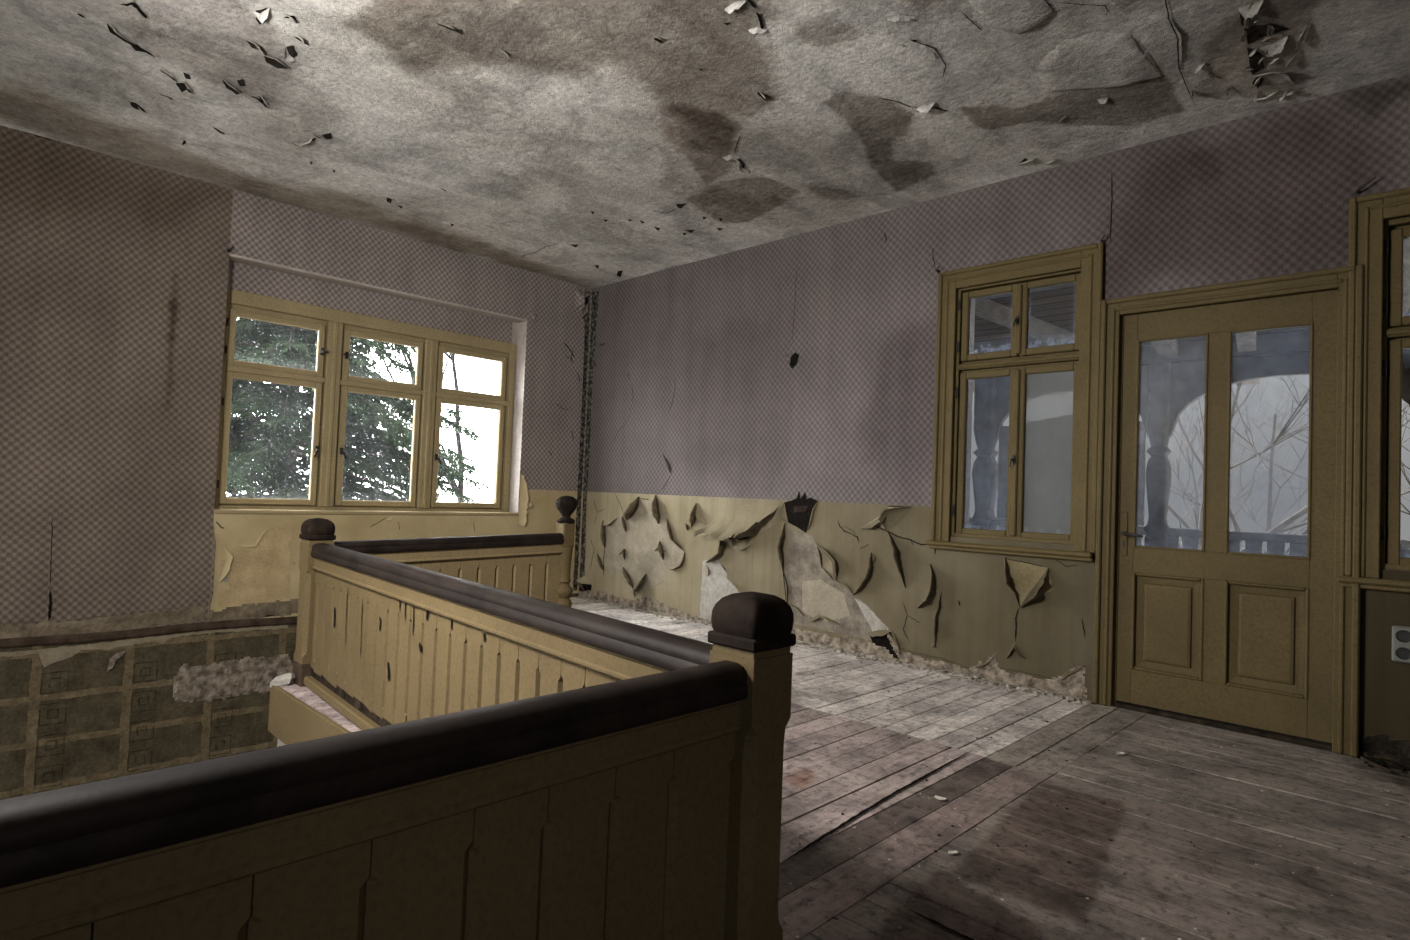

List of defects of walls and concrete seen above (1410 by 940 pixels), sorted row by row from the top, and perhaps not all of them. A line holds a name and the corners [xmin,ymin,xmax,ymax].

peeling [120,0,147,19]
peeling [107,23,194,100]
peeling [221,77,271,109]
peeling [246,8,310,70]
peeling [716,0,766,36]
crack [1045,0,1196,107]
peeling [1238,0,1309,103]
crack [46,516,54,620]
peeling [208,518,292,620]
flaking render [576,492,972,668]
peeling [997,558,1053,679]
spalling [173,654,293,703]